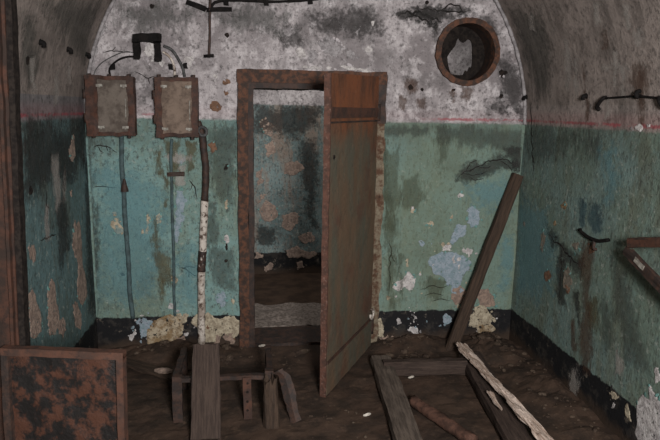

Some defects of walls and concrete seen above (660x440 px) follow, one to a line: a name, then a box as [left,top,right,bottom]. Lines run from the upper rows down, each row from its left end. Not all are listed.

damp [281,29,301,47]
damp [310,9,384,37]
crack [397,3,461,25]
damp [22,118,96,313]
peeling [72,220,87,330]
peeling [386,259,421,300]
peeling [419,205,483,308]
peeling [28,279,66,339]
flaking render [128,291,240,345]
flaking render [396,307,421,334]
flaking render [469,288,500,333]
peeling [609,367,660,440]